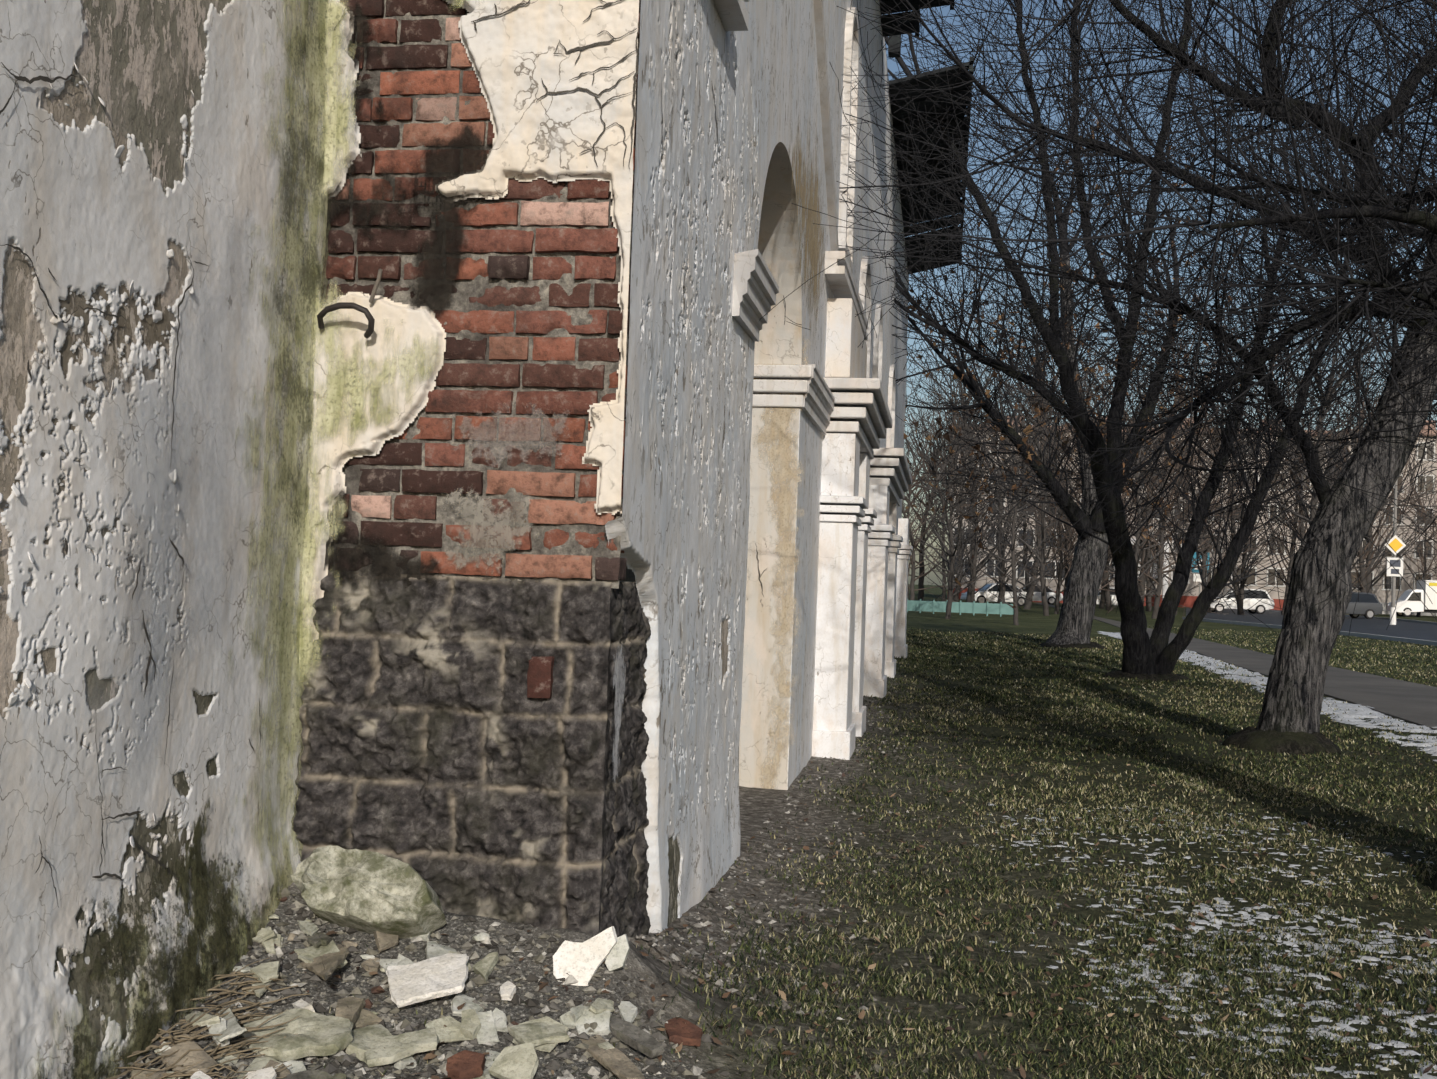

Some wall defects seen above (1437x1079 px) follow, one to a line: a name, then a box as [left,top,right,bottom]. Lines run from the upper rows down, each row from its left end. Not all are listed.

crack [0,62,78,114]
flaking render [41,0,232,195]
crack [471,0,530,31]
crack [536,0,663,169]
leakage [272,0,329,524]
peeling [0,239,195,718]
flaking render [291,0,680,937]
crack [132,562,174,764]
peeling [192,690,216,715]
crack [35,836,58,905]
crack [93,721,189,921]
leakage [37,841,263,1079]